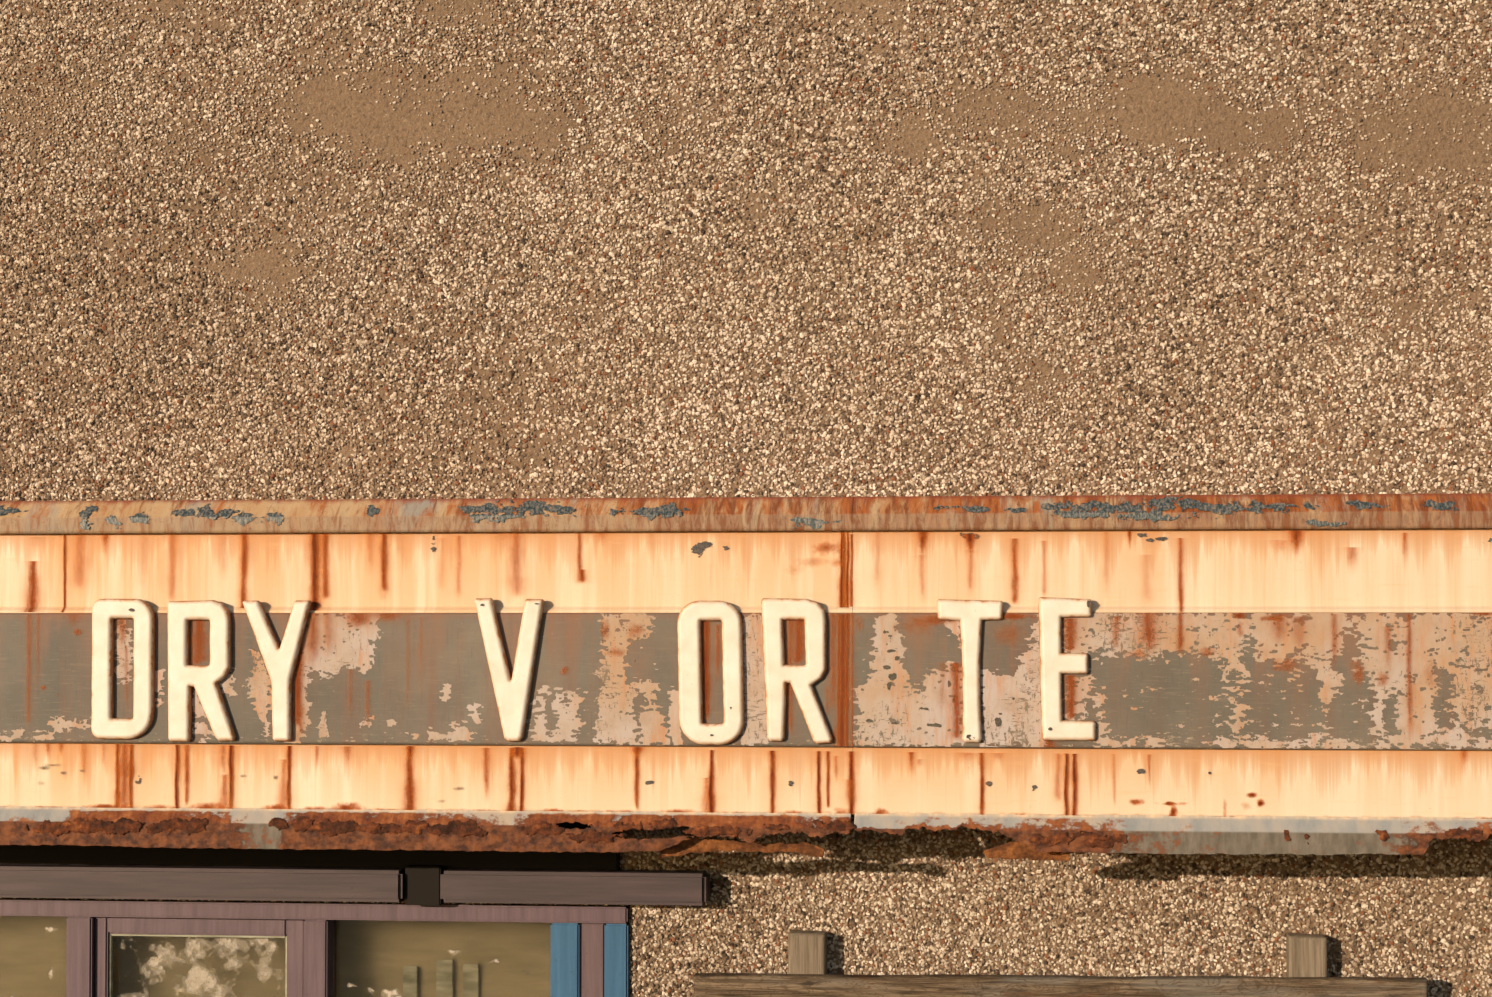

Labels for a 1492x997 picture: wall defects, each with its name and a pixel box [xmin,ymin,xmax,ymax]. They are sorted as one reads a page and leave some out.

peeling [457,499,576,523]
peeling [933,495,1391,542]
rust [24,561,38,612]
rust [61,534,80,612]
rust [1003,538,1024,619]
peeling [219,613,384,743]
peeling [526,613,683,745]
peeling [849,600,1492,750]
peeling [359,703,484,742]
rust [24,744,233,837]
rust [1029,741,1127,848]
rust [1445,818,1492,839]